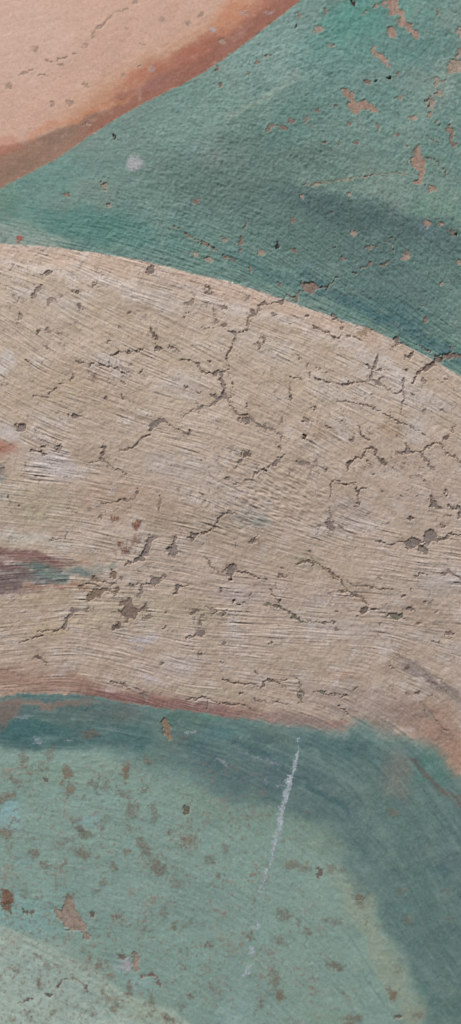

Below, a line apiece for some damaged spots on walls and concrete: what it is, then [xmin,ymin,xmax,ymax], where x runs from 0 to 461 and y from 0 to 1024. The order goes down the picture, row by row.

peeling [351,0,419,39]
peeling [334,88,380,130]
peeling [394,133,437,193]
crack [33,291,301,481]
crack [289,242,461,506]
spalling [398,489,461,555]
crack [24,607,94,642]
spalling [79,569,152,631]
crack [130,574,167,594]
crack [189,510,386,625]
crack [190,671,357,709]
peeling [52,895,95,940]